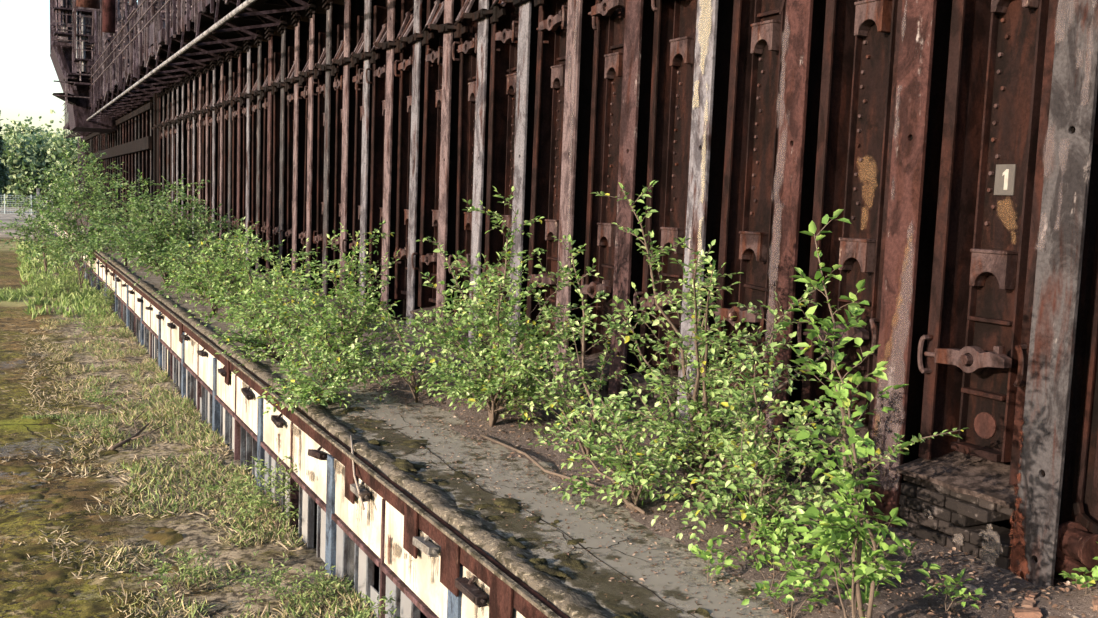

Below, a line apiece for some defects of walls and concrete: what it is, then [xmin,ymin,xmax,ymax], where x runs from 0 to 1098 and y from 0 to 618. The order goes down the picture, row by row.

leakage [332,456,344,499]
corrosion [1008,419,1029,581]
leakage [466,571,490,618]